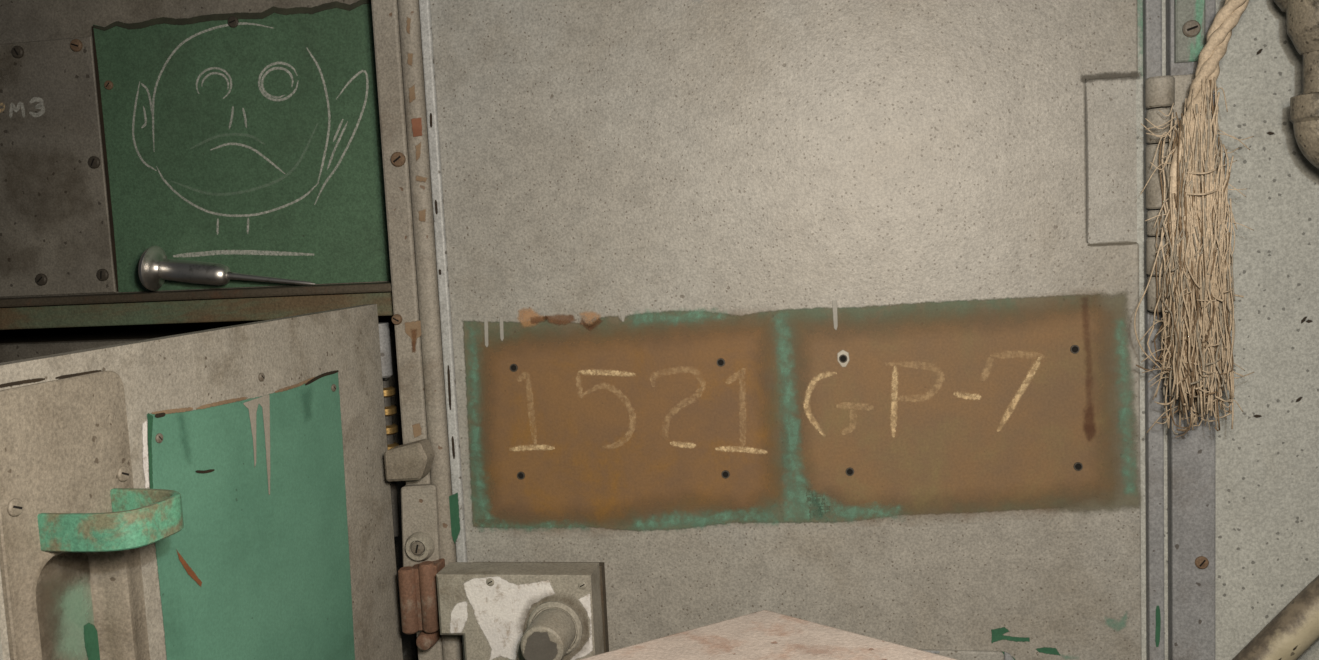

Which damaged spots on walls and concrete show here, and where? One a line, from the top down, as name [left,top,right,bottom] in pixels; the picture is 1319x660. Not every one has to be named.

corrosion [519,310,601,330]